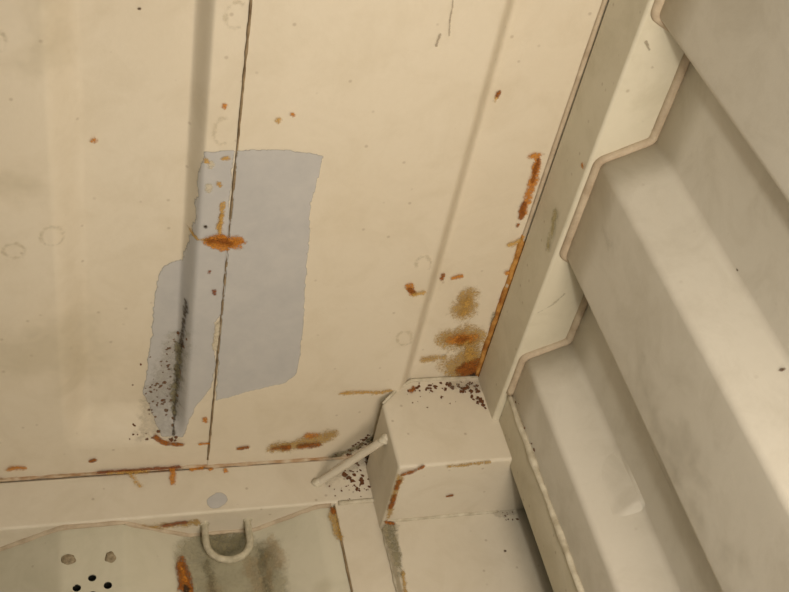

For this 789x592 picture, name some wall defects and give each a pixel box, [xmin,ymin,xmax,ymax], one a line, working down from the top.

rust [189,202,245,252]
rust [421,153,541,377]
peeling [145,331,187,442]
crack [153,298,188,447]
rust [267,430,337,452]
rust [87,459,214,487]
rust [387,465,425,518]
rust [149,519,200,529]
rust [176,533,286,592]